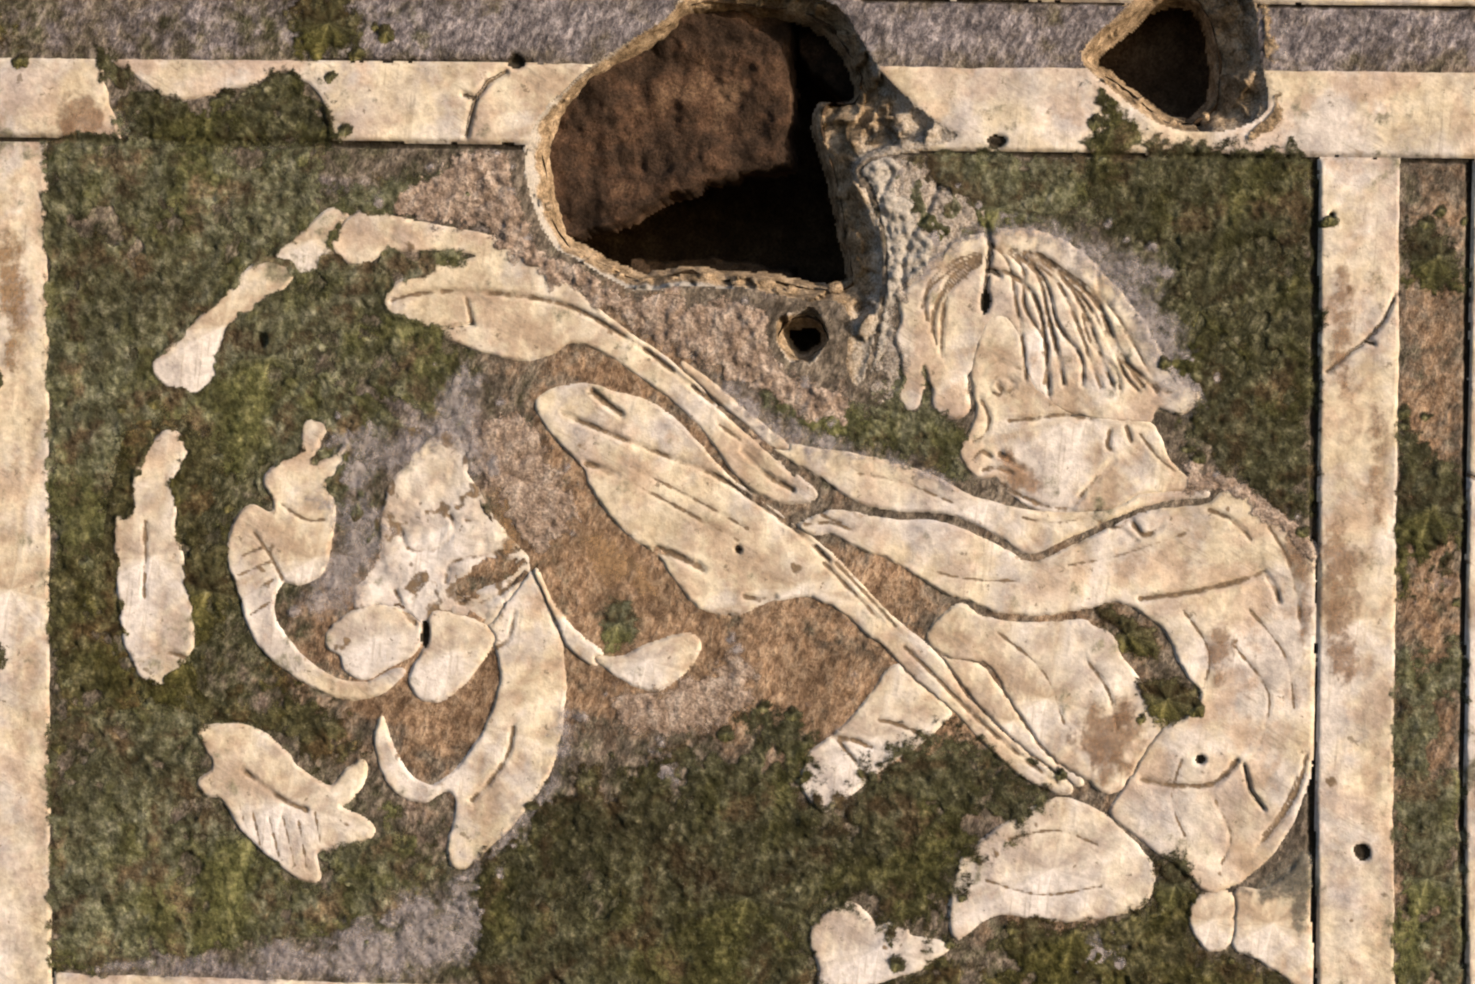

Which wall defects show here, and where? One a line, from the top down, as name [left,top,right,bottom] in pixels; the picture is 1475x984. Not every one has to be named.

spalling [1079,0,1288,144]
spalling [373,0,1219,459]
crack [1326,295,1396,371]